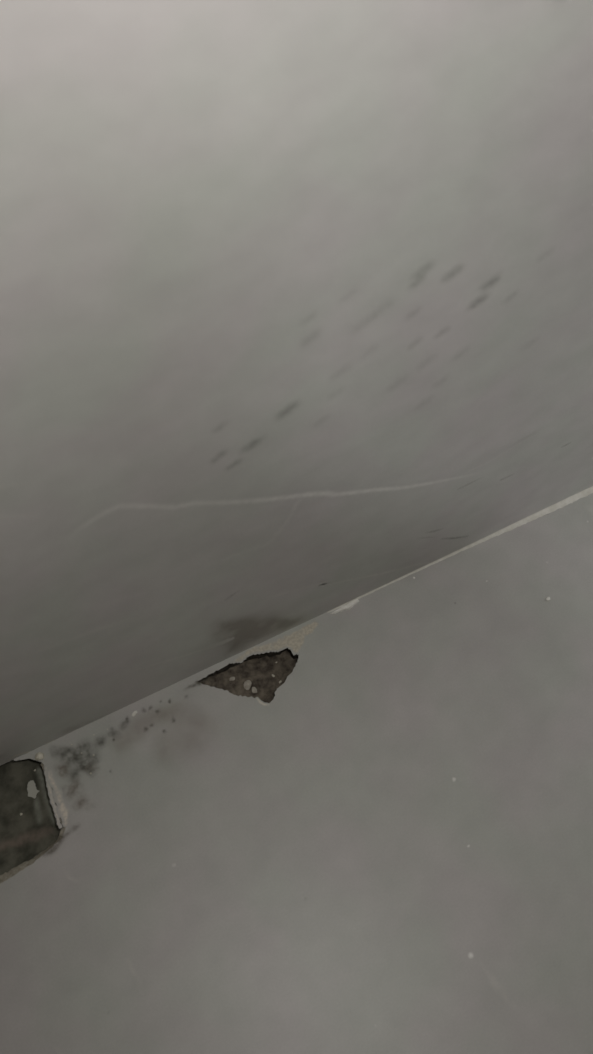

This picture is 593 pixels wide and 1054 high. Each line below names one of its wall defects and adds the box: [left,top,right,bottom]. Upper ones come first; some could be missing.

peeling [331,599,359,614]
spalling [197,619,321,707]
spalling [0,759,71,884]